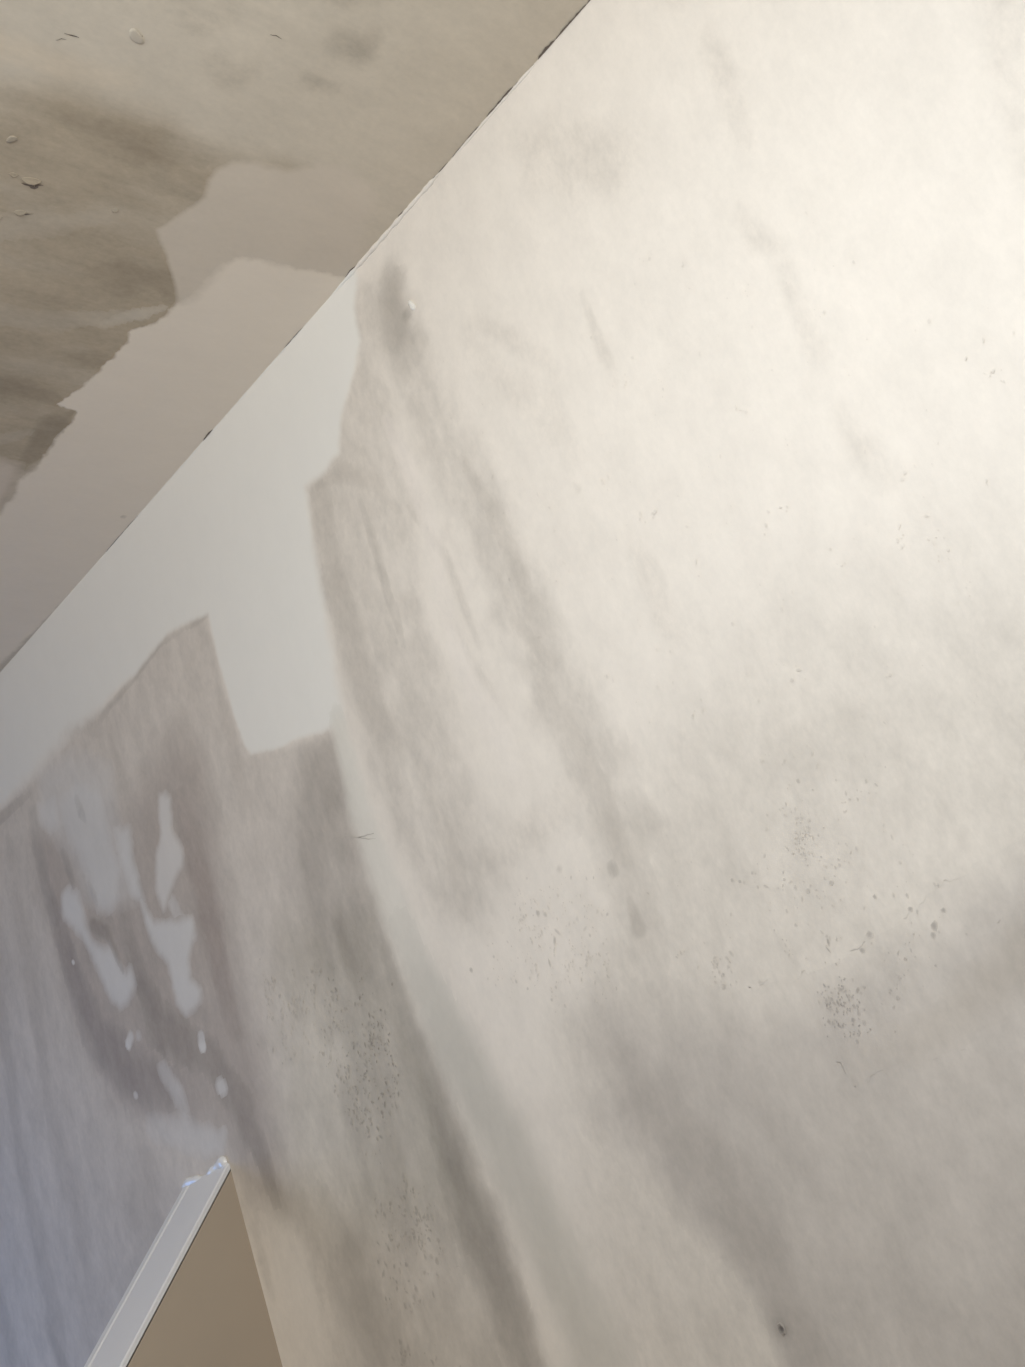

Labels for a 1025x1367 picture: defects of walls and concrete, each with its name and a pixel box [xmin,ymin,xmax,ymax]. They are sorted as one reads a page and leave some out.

damp [0,67,315,475]
damp [726,193,850,377]
peeling [36,743,204,1019]
damp [0,713,297,1367]
damp [61,244,1025,1367]